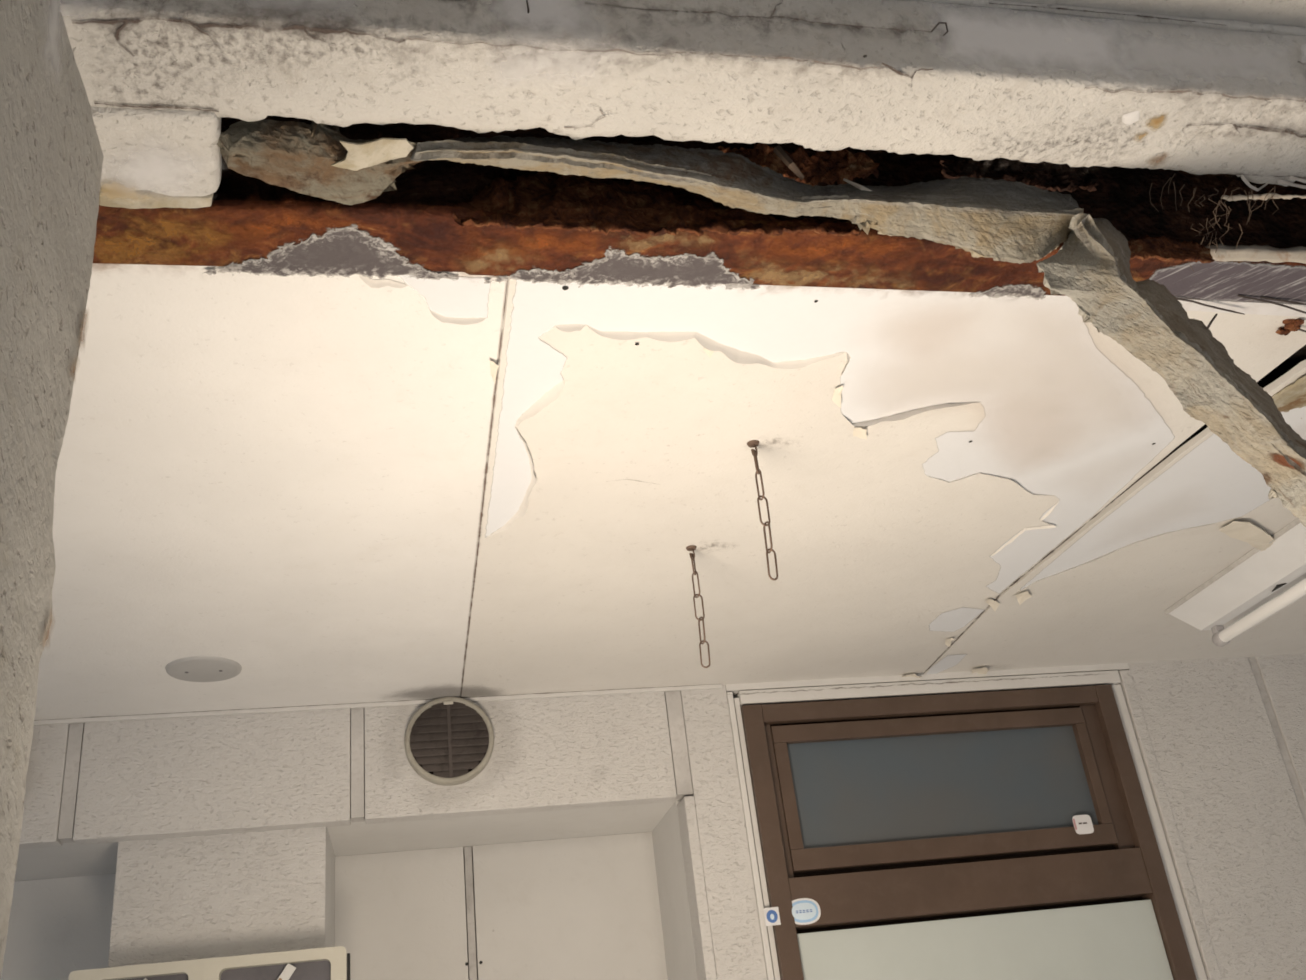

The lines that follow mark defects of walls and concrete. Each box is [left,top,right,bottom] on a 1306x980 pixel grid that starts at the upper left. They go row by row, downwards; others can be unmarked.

crack [587,0,930,32]
crack [72,17,933,79]
peeling [331,138,414,171]
spalling [99,187,213,209]
peeling [1241,175,1306,191]
rust [94,211,331,264]
rust [451,171,893,287]
peeling [1150,261,1306,304]
peeling [205,224,1276,647]
peeling [1281,406,1306,440]
crack [674,455,1168,695]